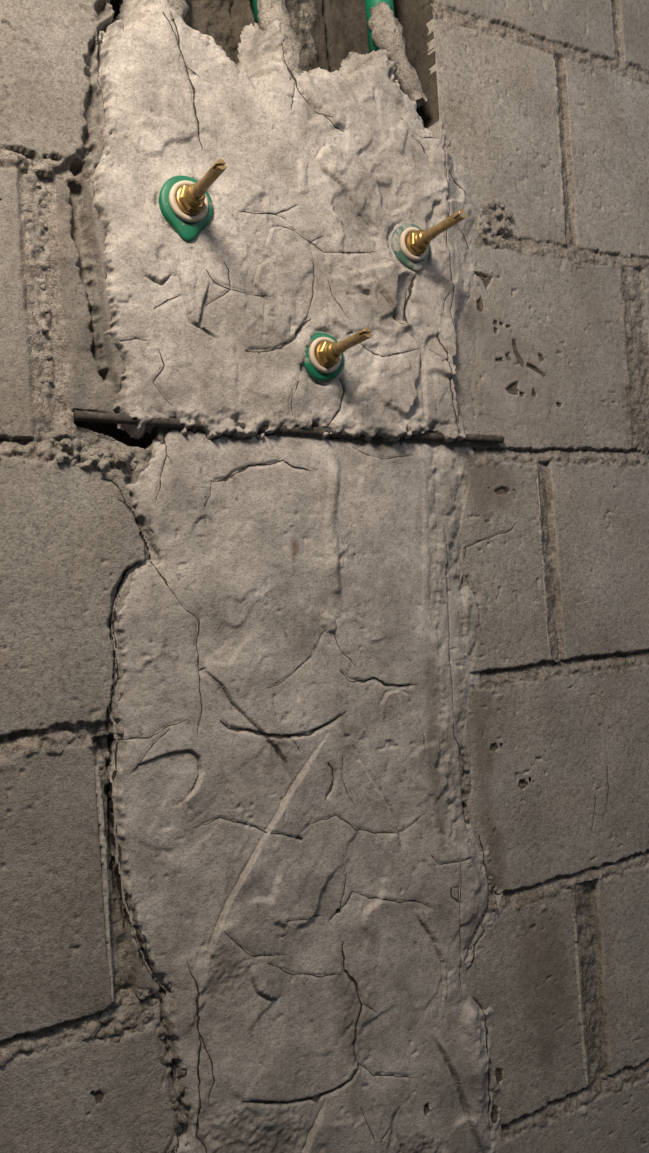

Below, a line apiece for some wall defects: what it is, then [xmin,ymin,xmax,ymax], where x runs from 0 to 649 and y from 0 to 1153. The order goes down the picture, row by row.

crack [163,11,203,149]
crack [281,43,343,132]
crack [153,262,267,310]
crack [240,118,470,429]
peeling [474,269,493,312]
peeling [493,320,546,377]
peeling [506,381,536,397]
crack [271,629,417,687]
crack [443,522,516,749]
crack [100,338,346,1153]
crack [197,756,423,841]
crack [224,785,493,1129]